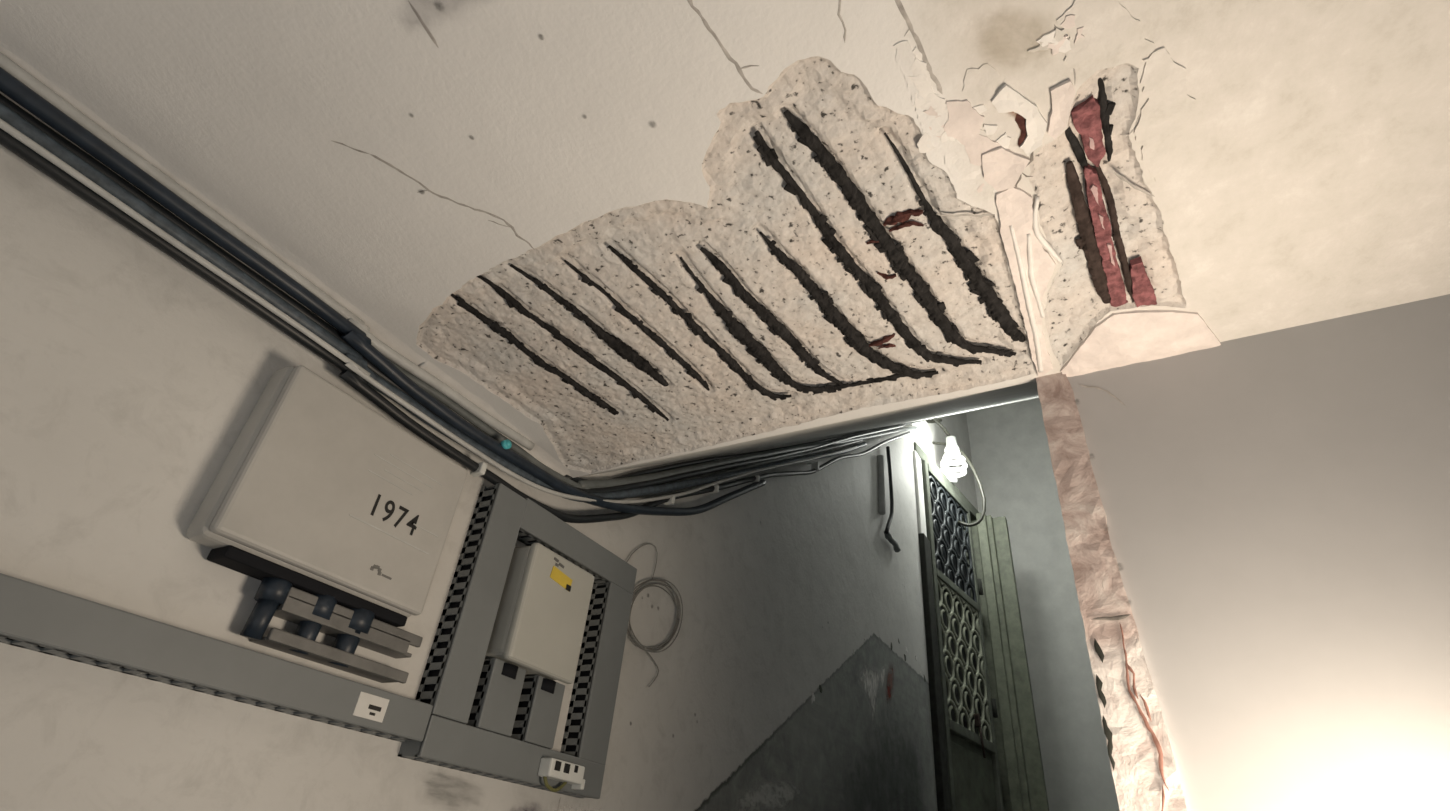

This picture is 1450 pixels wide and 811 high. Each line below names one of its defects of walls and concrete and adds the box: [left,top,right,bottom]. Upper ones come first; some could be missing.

crack [687,0,763,94]
crack [333,141,535,250]
spalling [416,0,1197,474]
corrosion [866,209,924,244]
corrosion [869,333,896,349]
crack [1091,614,1169,811]